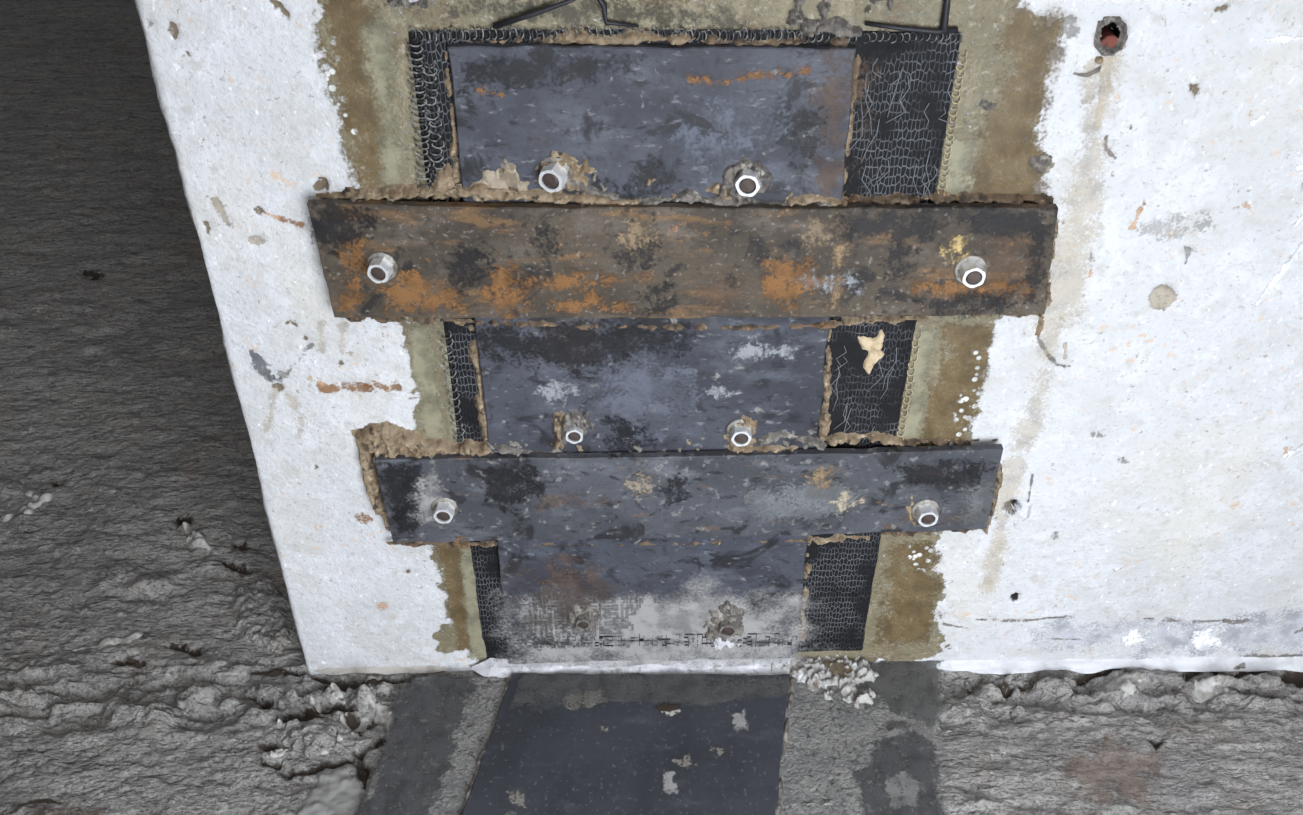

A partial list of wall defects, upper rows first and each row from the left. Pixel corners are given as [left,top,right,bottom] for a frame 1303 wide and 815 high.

corrosion [331,239,471,316]
corrosion [482,260,654,322]
water stain [308,0,1064,488]
corrosion [759,256,823,311]
corrosion [911,277,1035,299]
water stain [371,459,427,535]
water stain [481,463,546,517]
water stain [659,473,692,507]
water stain [429,541,487,663]
water stain [731,531,951,815]